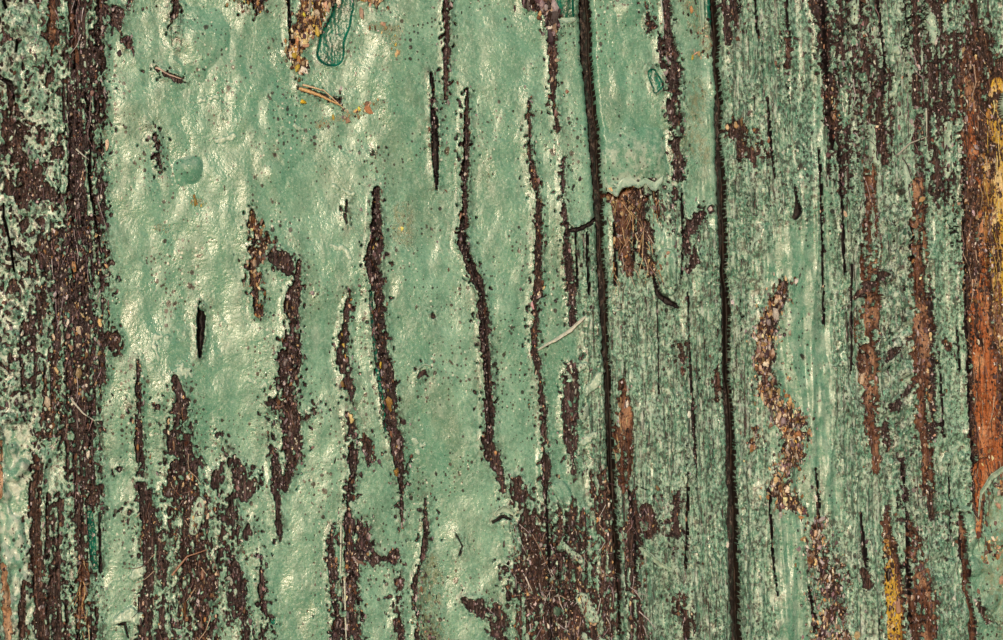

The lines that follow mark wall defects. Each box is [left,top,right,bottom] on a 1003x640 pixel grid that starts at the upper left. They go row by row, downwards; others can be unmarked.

peeling [0,0,283,640]
crack [196,301,208,358]
crack [233,147,443,640]
crack [428,0,745,617]
peeling [455,0,792,640]
peeling [800,0,1003,640]